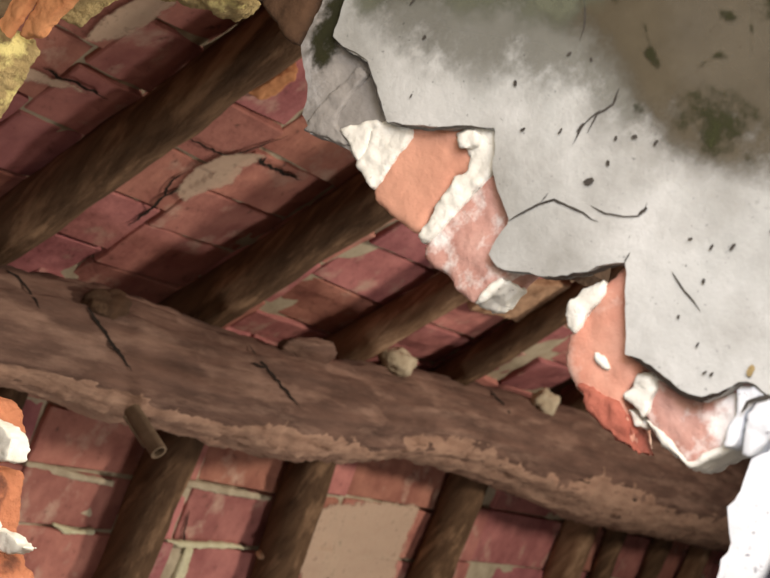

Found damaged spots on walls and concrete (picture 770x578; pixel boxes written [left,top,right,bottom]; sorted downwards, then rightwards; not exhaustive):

spalling [301,0,386,161]
damp [359,0,650,117]
peeling [457,129,483,150]
crack [573,89,619,144]
crack [128,172,186,226]
crack [509,193,647,222]
spalling [467,278,572,322]
crack [88,307,132,371]
crack [249,345,299,405]
peeling [594,352,611,370]